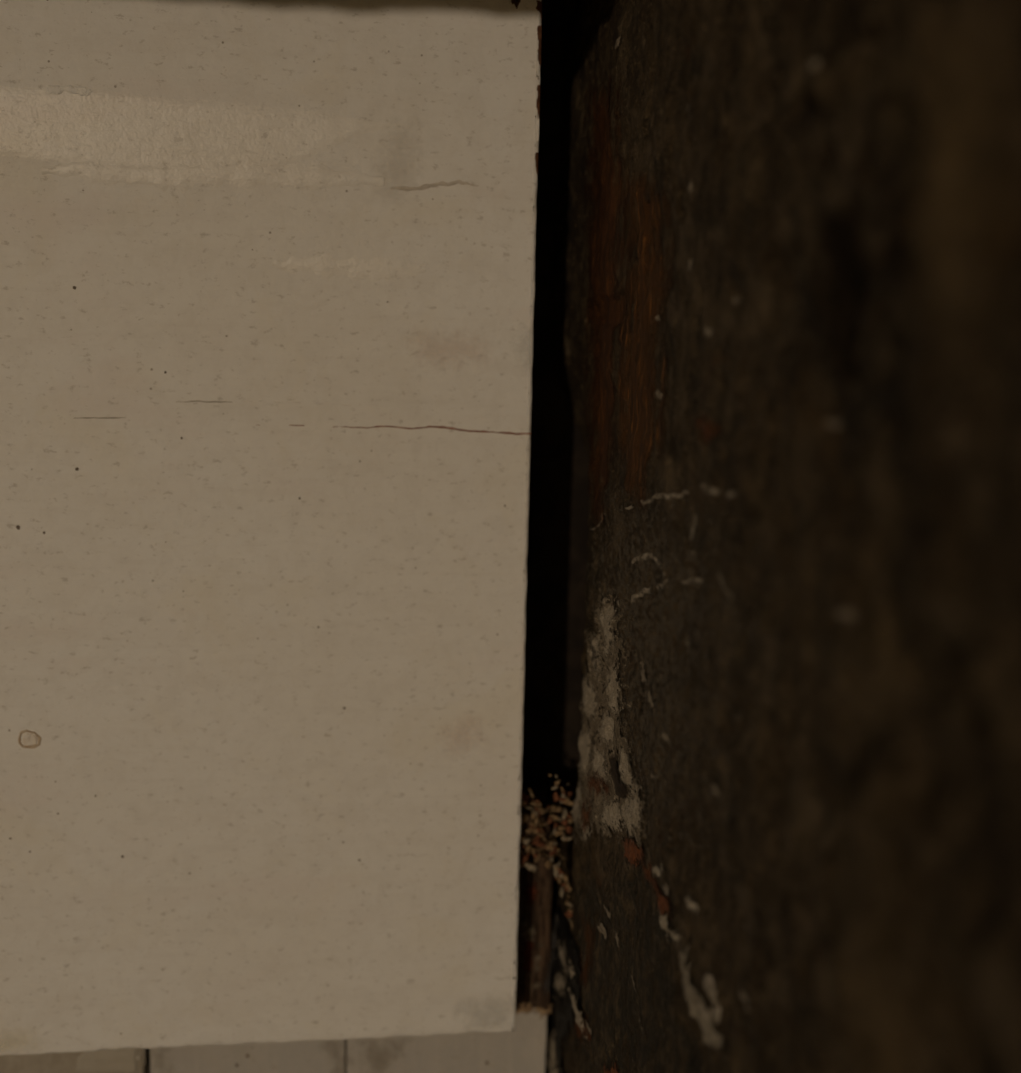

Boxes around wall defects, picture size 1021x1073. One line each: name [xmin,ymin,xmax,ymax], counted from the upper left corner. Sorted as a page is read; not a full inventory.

crack [81,414,126,422]
crack [337,426,531,435]